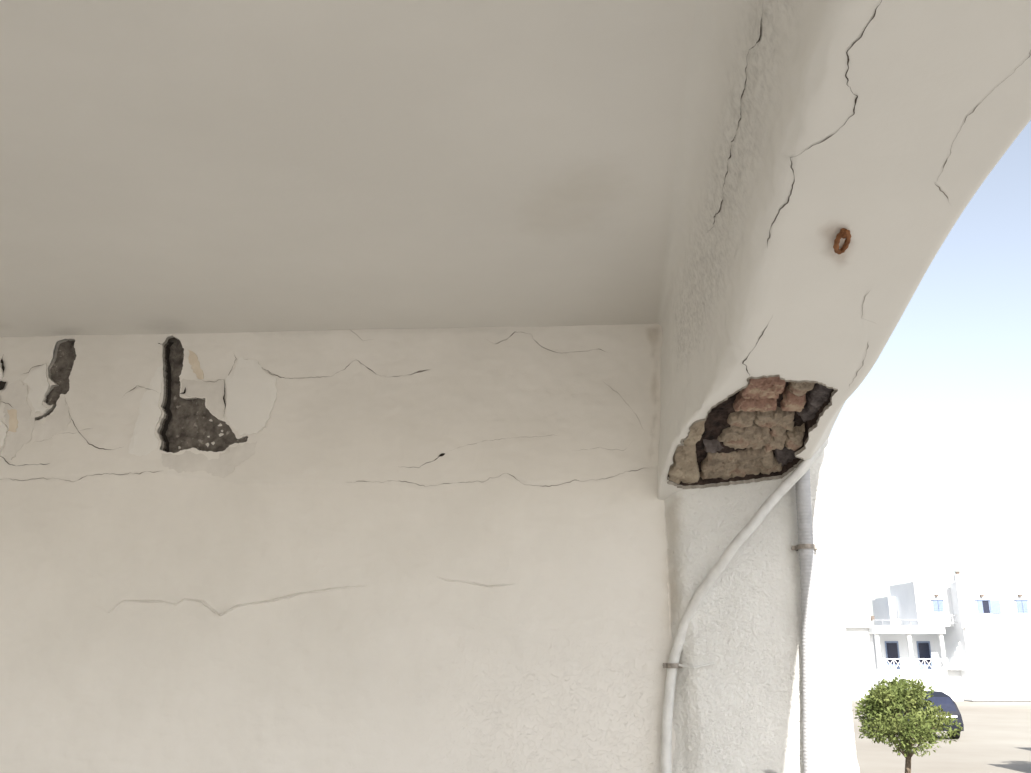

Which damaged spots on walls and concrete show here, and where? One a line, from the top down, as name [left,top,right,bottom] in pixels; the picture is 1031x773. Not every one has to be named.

crack [707,13,763,233]
crack [767,0,882,247]
peeling [0,339,76,466]
crack [11,400,159,482]
peeling [120,336,277,478]
crack [352,385,645,487]
spalling [667,375,838,489]